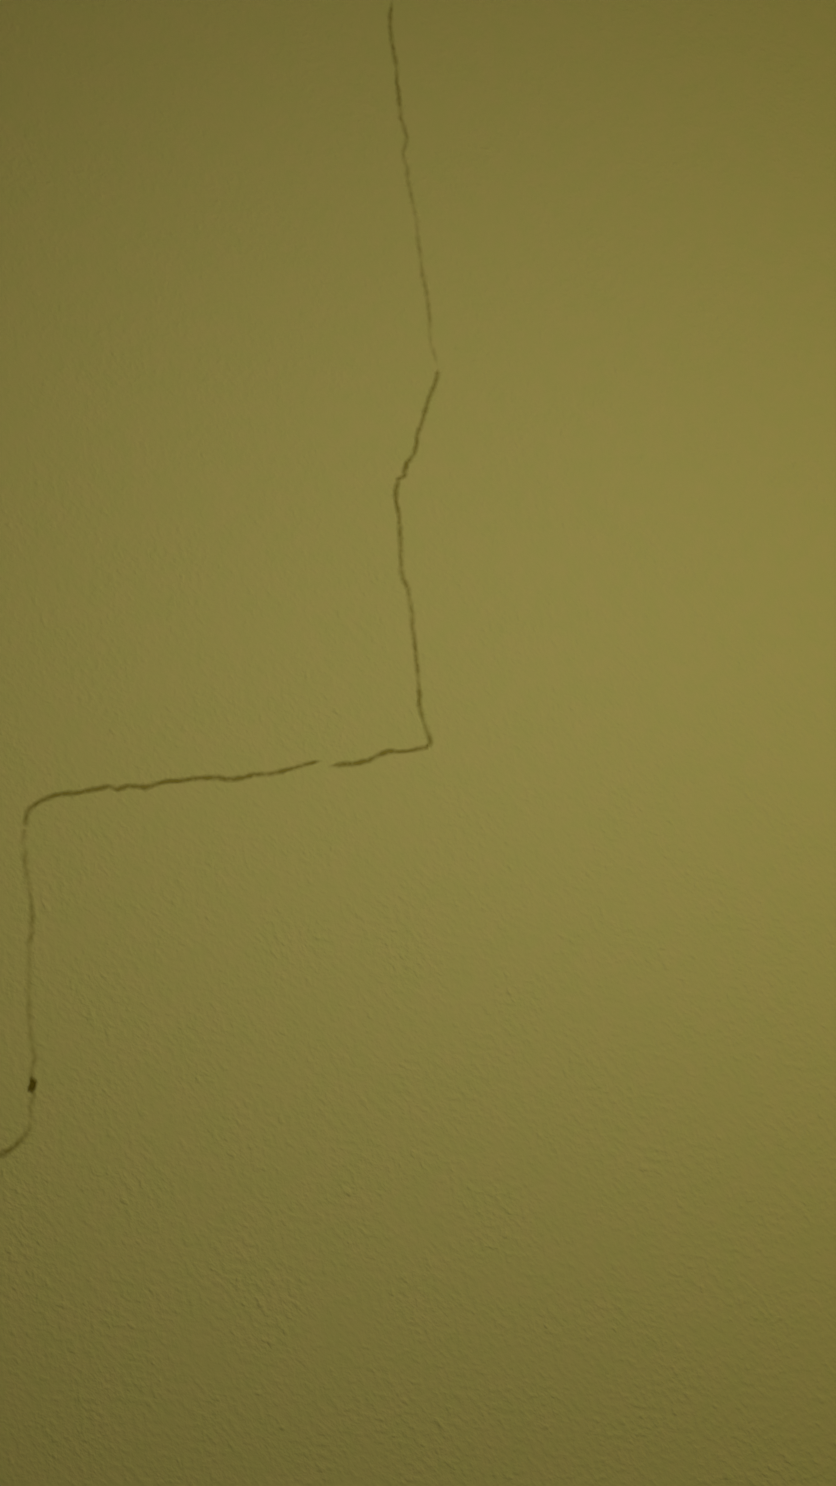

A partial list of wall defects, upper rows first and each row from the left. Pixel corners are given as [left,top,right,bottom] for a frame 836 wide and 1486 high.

crack [395,410,426,533]
crack [26,647,431,818]